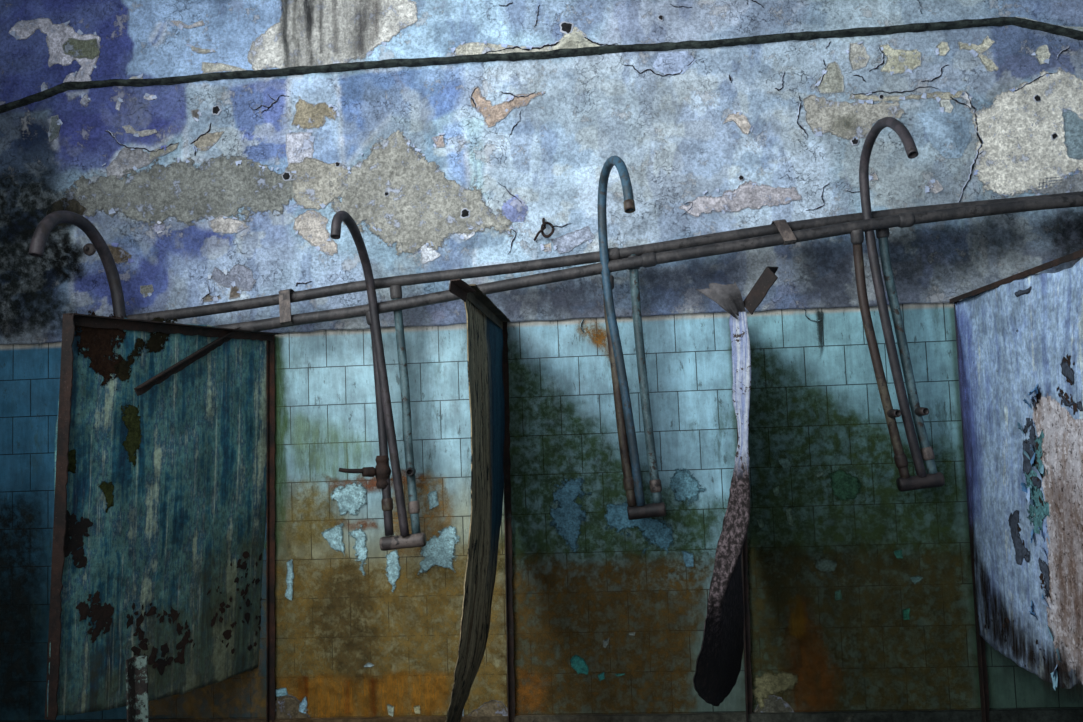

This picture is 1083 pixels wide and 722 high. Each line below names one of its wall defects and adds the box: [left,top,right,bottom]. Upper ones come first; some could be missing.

damp [0,171,83,337]
peeling [9,17,101,105]
peeling [46,96,514,264]
peeling [186,0,418,74]
crack [484,2,696,76]
crack [775,41,831,137]
crack [853,47,983,203]
peeling [803,41,1083,199]
corrosion [64,510,93,568]
corrosion [126,602,195,676]
corrosion [207,470,467,718]
corrosion [463,544,542,716]